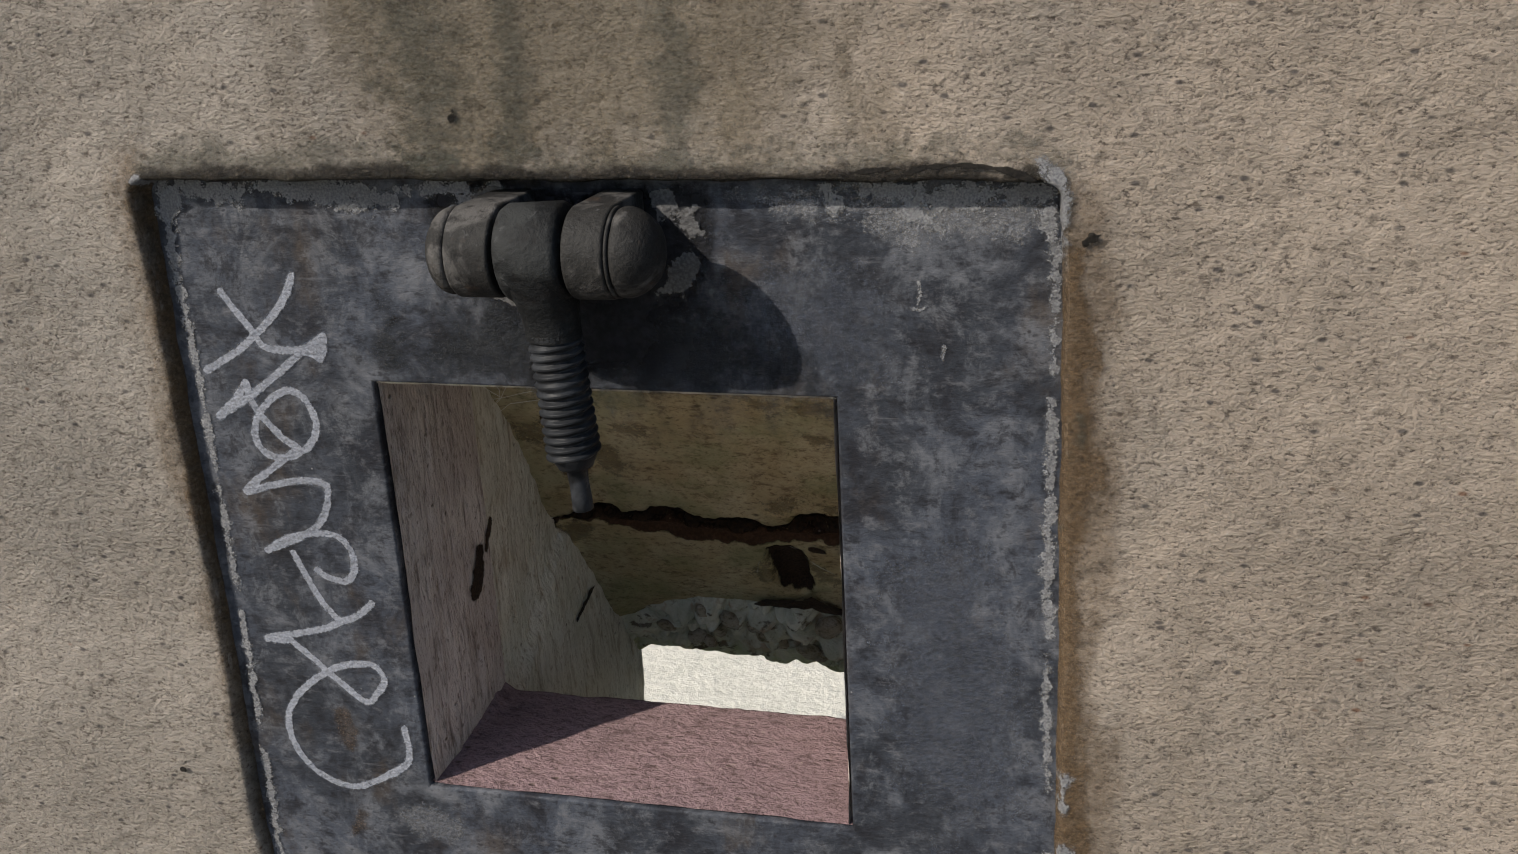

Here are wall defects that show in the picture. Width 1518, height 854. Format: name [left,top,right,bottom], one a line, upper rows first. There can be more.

damp [128,0,1073,591]
damp [238,609,263,725]
crack [577,586,595,622]
crack [552,502,842,615]
spalling [620,596,844,672]
spalling [750,545,842,590]
damp [1038,397,1060,640]
damp [1040,662,1074,814]
damp [259,745,285,854]
damp [1042,844,1076,854]